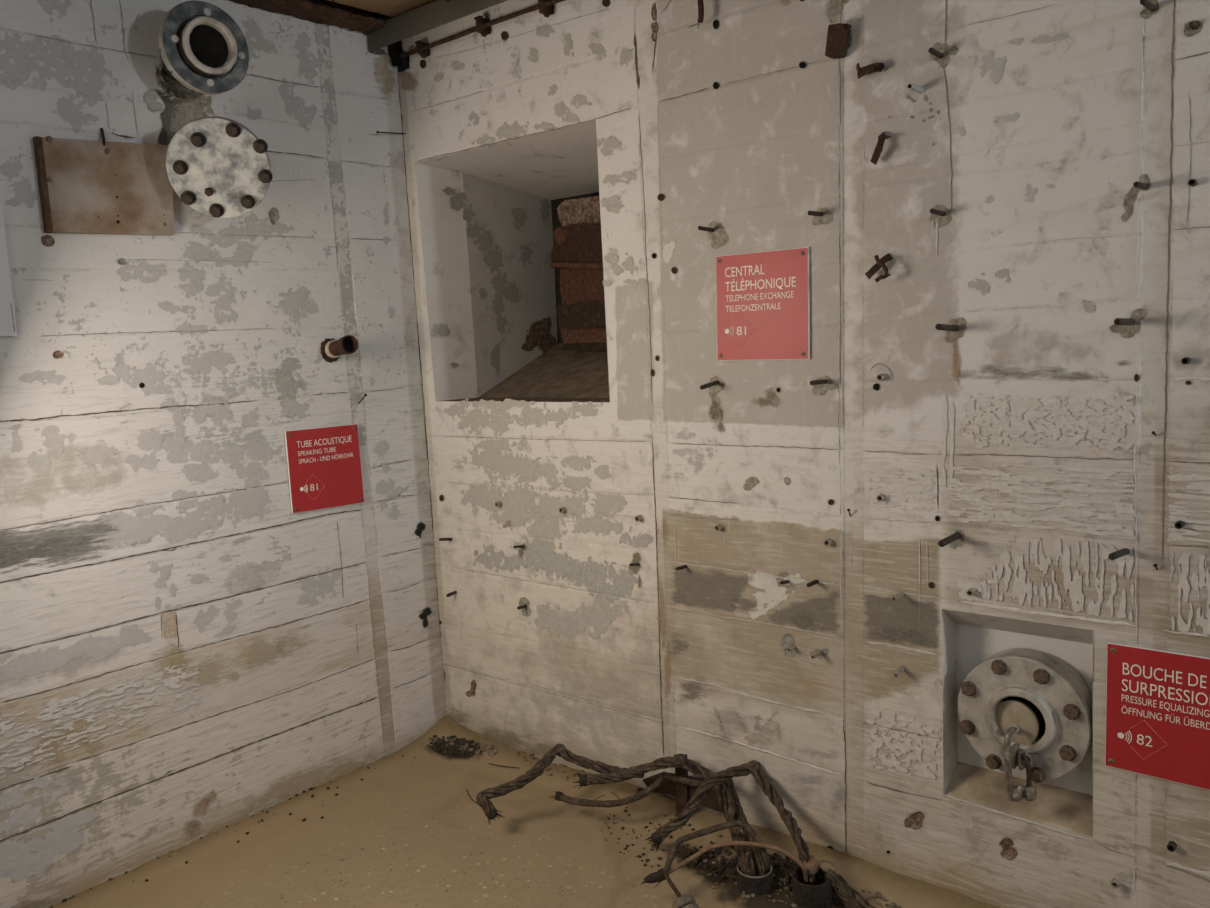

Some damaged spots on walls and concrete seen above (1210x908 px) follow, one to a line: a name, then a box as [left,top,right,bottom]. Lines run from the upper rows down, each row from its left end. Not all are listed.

peeling [0,29,122,134]
spalling [143,62,215,145]
rust [399,0,566,89]
peeling [19,351,65,386]
peeling [117,207,295,336]
peeling [442,186,552,376]
spalling [521,317,558,353]
peeling [81,362,275,549]
peeling [441,398,653,640]
peeling [0,562,242,681]
peeling [982,537,1089,613]
peeling [0,664,201,773]